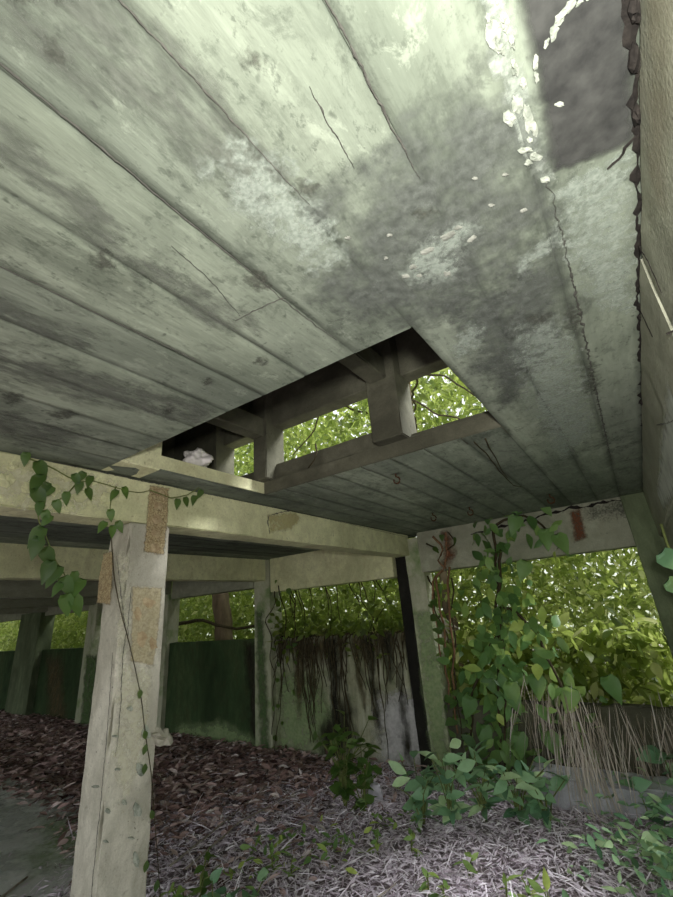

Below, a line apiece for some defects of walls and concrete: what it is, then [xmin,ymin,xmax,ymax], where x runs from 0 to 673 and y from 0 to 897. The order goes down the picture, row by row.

crack [0,266,196,360]
crack [0,62,336,340]
crack [119,0,310,205]
damp [203,138,343,258]
crack [309,86,354,167]
crack [325,0,420,178]
damp [323,0,636,456]
peeling [485,0,588,166]
crack [607,0,673,453]
corrosion [570,509,586,541]
crack [91,562,132,897]
damp [278,630,420,766]